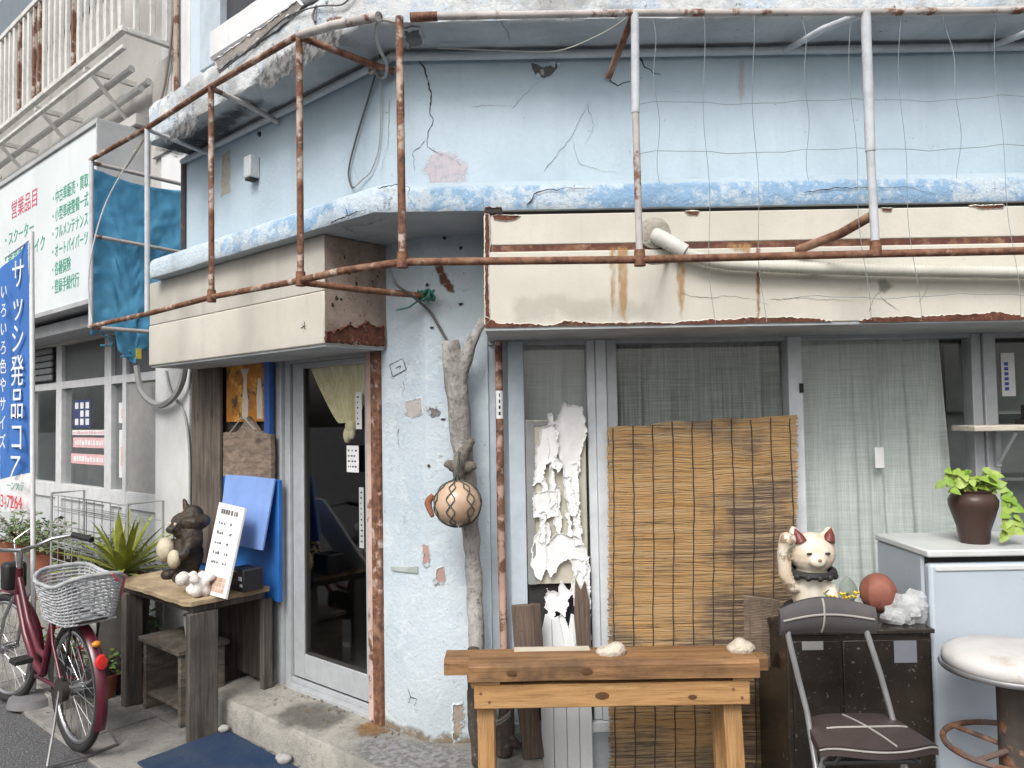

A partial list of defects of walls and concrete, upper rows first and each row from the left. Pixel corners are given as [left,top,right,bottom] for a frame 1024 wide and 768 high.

spalling [529,61,561,80]
crack [331,61,467,235]
crack [526,104,600,206]
crack [804,185,932,193]
spalling [325,236,385,332]
corrosion [484,214,832,327]
corrosion [859,310,1024,322]
peeling [403,397,446,421]
peeling [421,543,447,586]